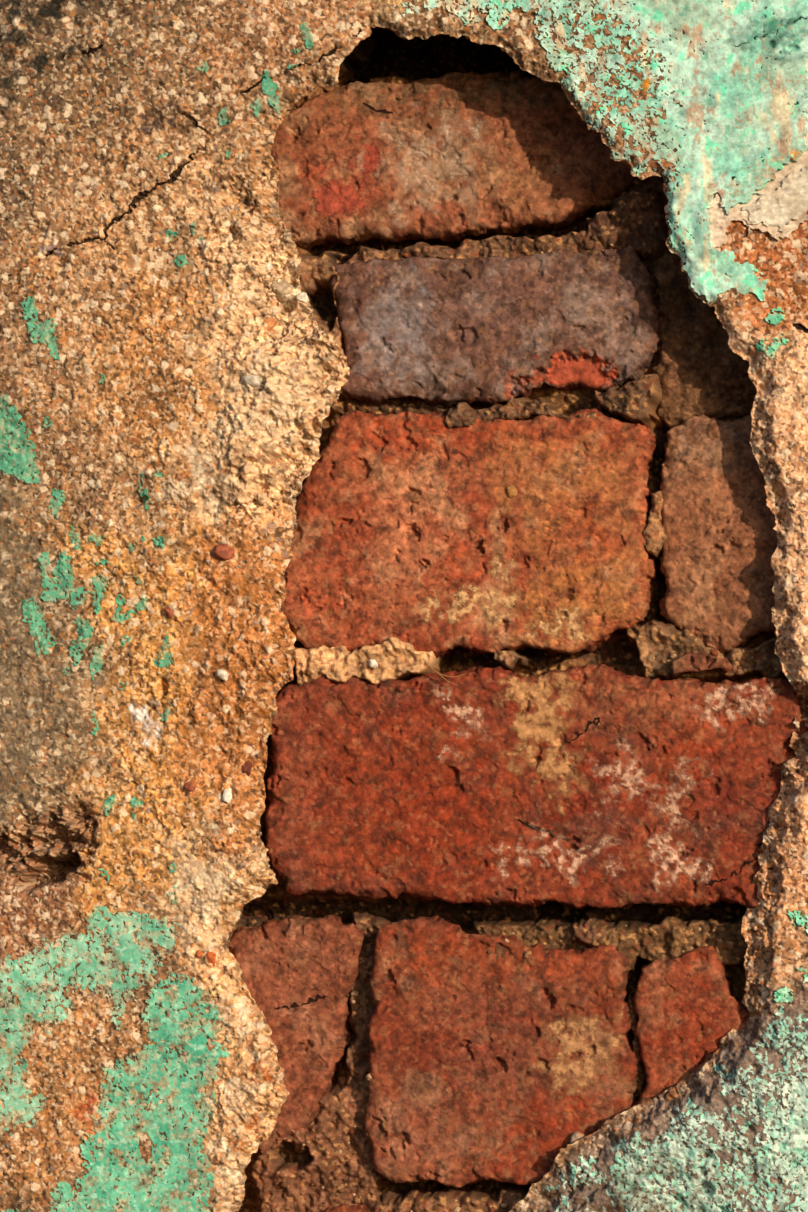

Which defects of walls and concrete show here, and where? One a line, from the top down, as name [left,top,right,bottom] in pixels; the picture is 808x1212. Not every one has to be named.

crack [59,44,103,61]
peeling [251,70,282,117]
crack [227,29,361,100]
peeling [287,22,314,70]
crack [8,113,209,277]
spalling [311,143,382,215]
peeling [402,0,808,360]
peeling [173,254,189,268]
spalling [542,347,618,388]
spalling [216,432,299,509]
peeling [787,910,808,933]
peeling [545,966,808,1212]